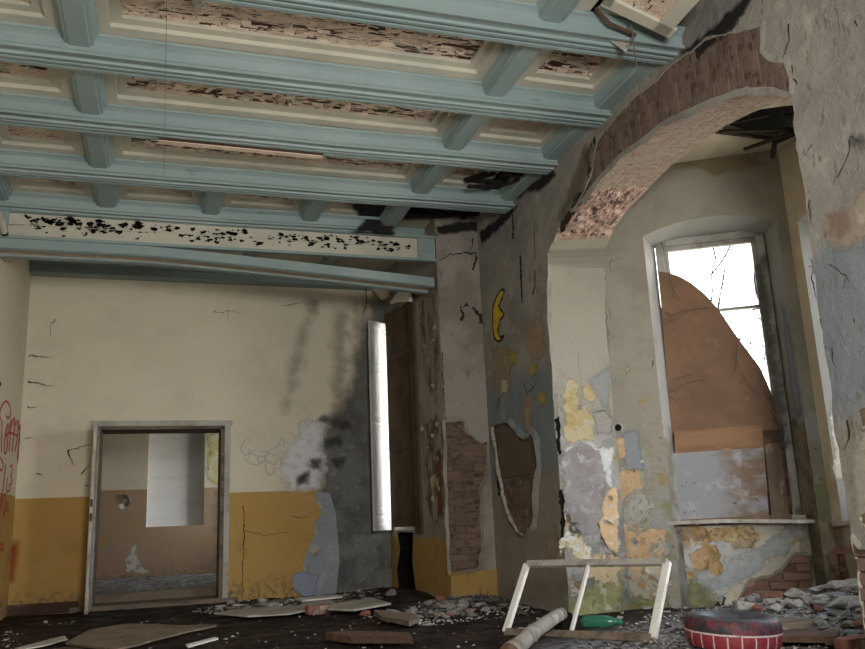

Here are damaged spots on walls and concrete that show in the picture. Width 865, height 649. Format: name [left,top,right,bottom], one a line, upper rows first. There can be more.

peeling [121,0,484,61]
peeling [538,50,606,77]
flaking render [556,20,795,240]
peeling [23,214,411,252]
crack [241,505,304,598]
leakage [280,299,392,593]
flaking render [420,396,541,576]
flaking render [546,422,673,600]
peeling [680,524,760,583]
flaking render [737,552,813,601]
peeling [827,407,865,637]